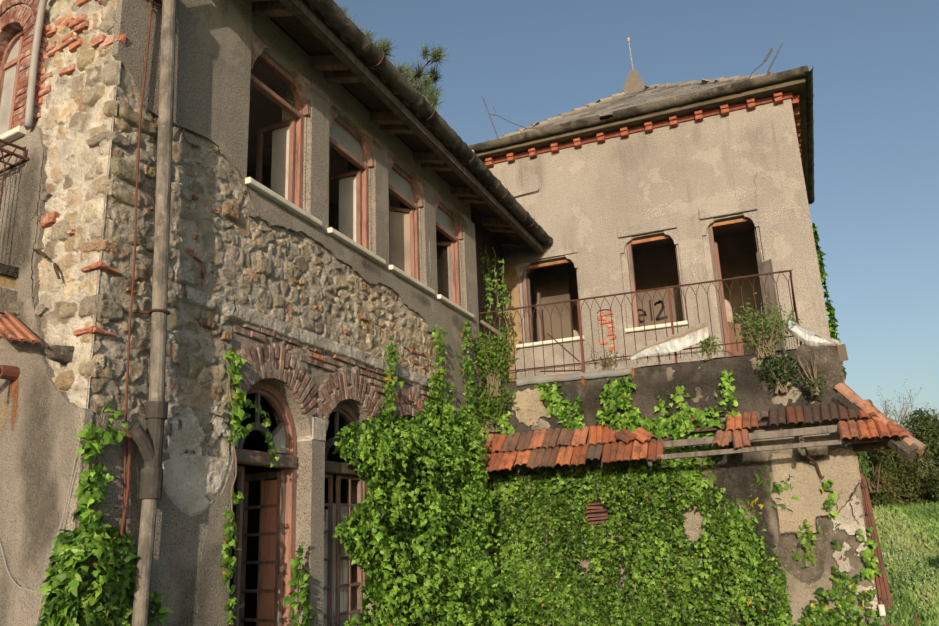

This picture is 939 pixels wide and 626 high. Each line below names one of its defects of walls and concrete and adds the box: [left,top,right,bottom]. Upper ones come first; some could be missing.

flaking render [35,0,158,416]
corrosion [10,379,18,426]
leakage [22,375,56,564]
flaking render [161,125,445,517]
flaking render [504,261,551,427]
flaking render [597,310,617,356]
flaking render [770,447,880,625]